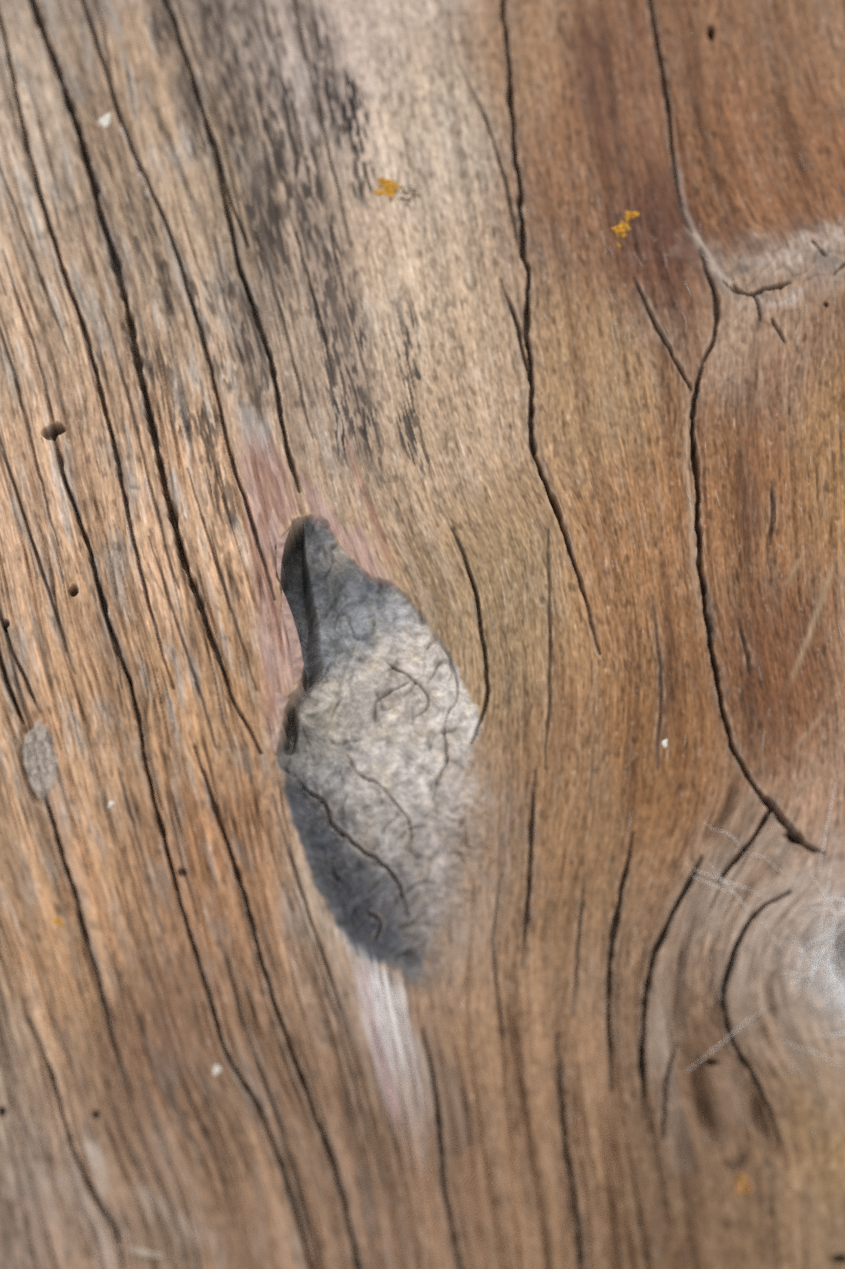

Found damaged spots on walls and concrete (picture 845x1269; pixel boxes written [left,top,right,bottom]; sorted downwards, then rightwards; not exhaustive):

crack [0,0,276,755]
crack [0,250,314,1269]
crack [162,0,301,492]
crack [193,747,363,1269]
crack [297,528,491,942]
crack [458,0,602,654]
crack [605,0,823,1144]